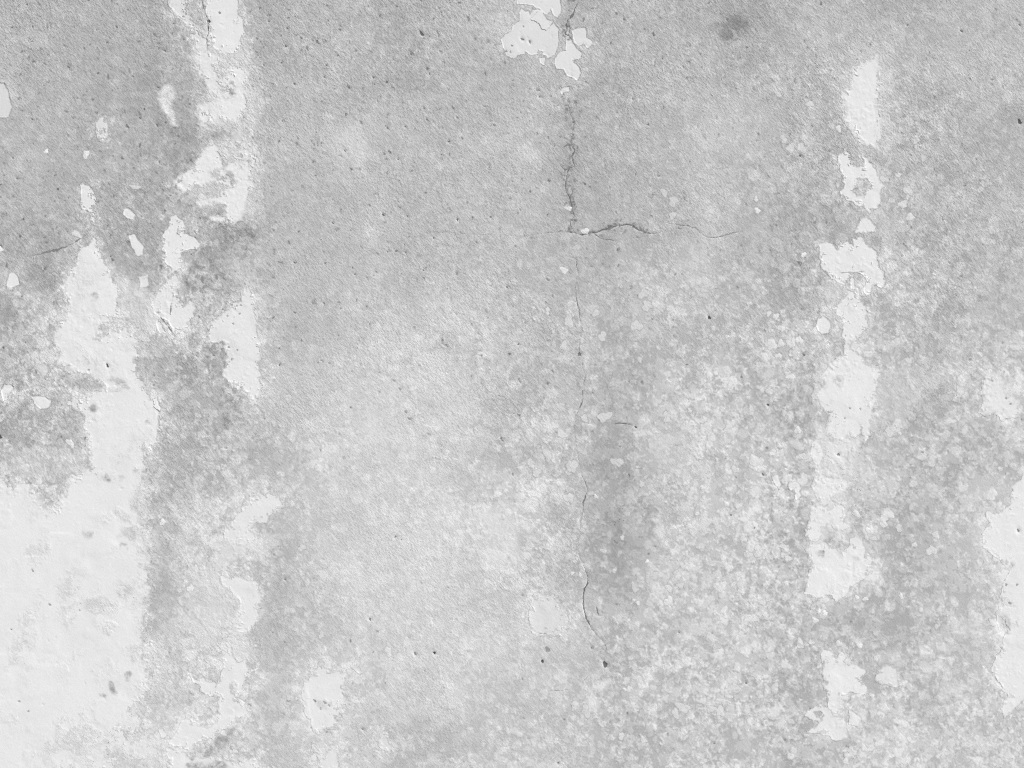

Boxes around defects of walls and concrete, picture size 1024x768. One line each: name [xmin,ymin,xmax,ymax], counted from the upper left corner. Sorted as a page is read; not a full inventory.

peeling [501,0,594,95]
peeling [138,0,260,335]
crack [547,108,736,240]
peeling [762,52,888,602]
peeling [978,377,1024,421]
peeling [0,182,265,768]
crack [583,569,606,646]
peeling [981,473,1024,719]
peeling [805,649,900,765]